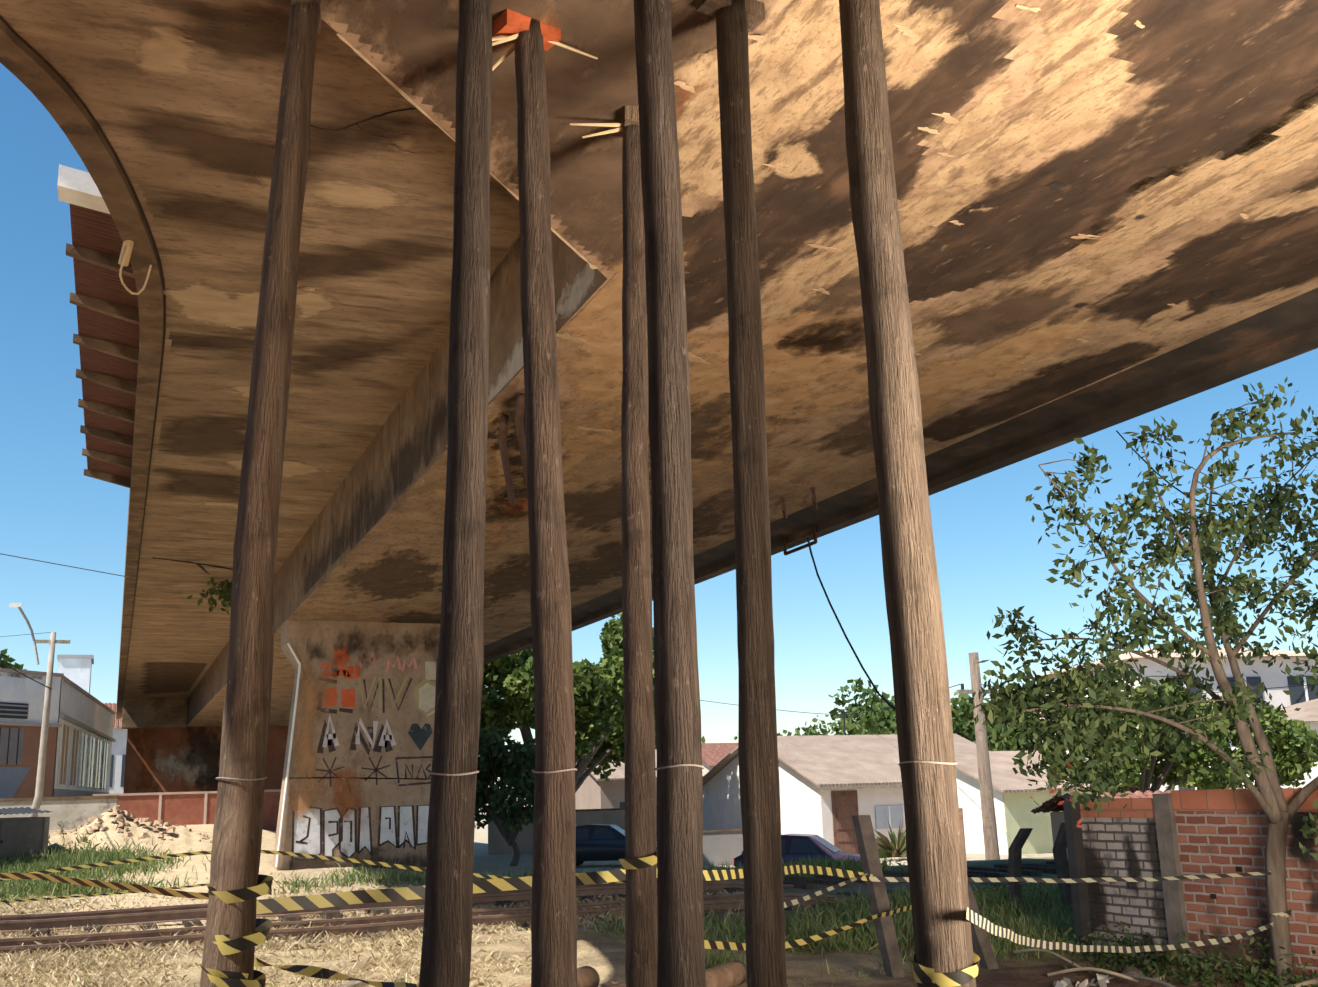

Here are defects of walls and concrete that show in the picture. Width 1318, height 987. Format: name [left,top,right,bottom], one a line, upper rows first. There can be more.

crack [310,108,417,128]
leakage [682,201,728,332]
leakage [754,105,852,288]
leakage [883,0,1318,347]
leakage [766,275,867,425]
leakage [817,401,873,456]
leakage [923,342,1166,442]
leakage [304,361,448,653]